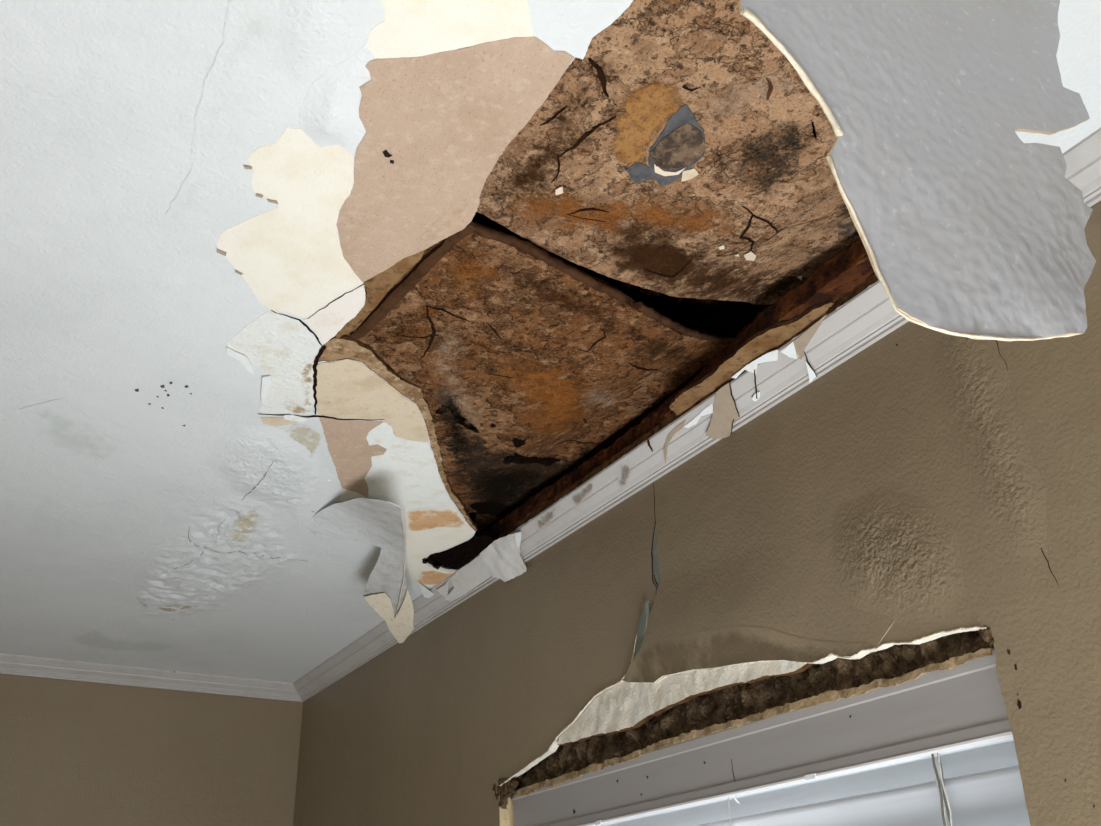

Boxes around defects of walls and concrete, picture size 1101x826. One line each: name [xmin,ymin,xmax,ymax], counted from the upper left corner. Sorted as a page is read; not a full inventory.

peeling [611,82,705,187]
peeling [216,0,575,510]
crack [261,284,384,426]
peeling [663,314,827,464]
peeling [419,531,527,601]
flaking render [492,625,994,809]
water stain [623,626,873,682]